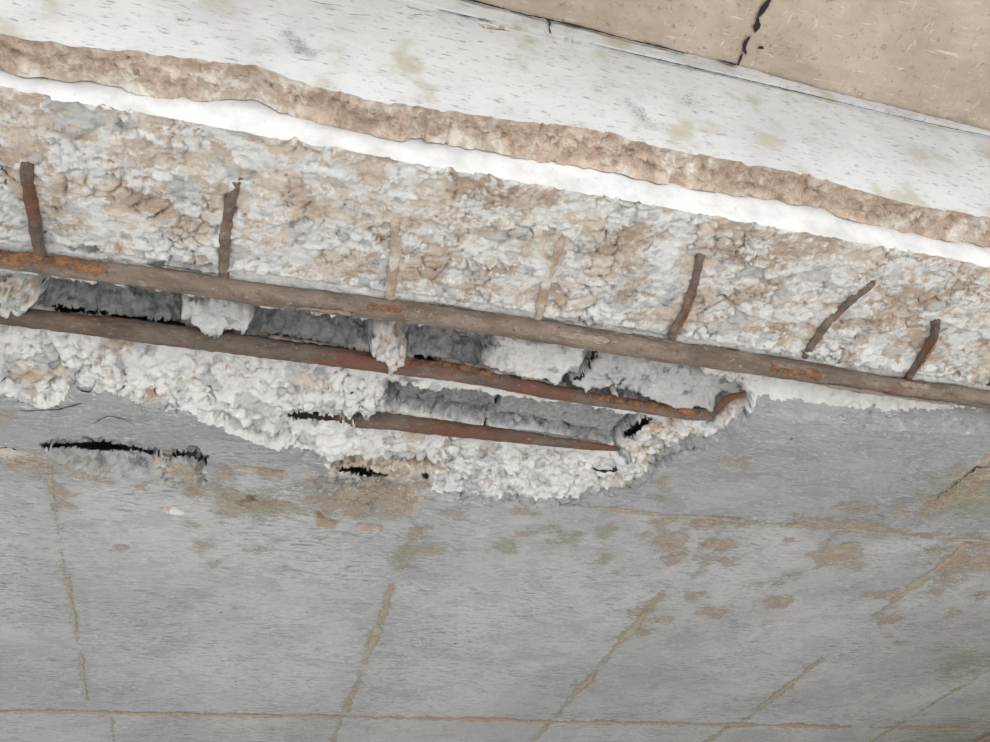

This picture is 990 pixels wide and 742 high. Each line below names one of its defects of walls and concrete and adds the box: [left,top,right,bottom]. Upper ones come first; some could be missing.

flaking render [0,34,990,247]
crack [594,0,990,137]
spalling [0,86,990,532]